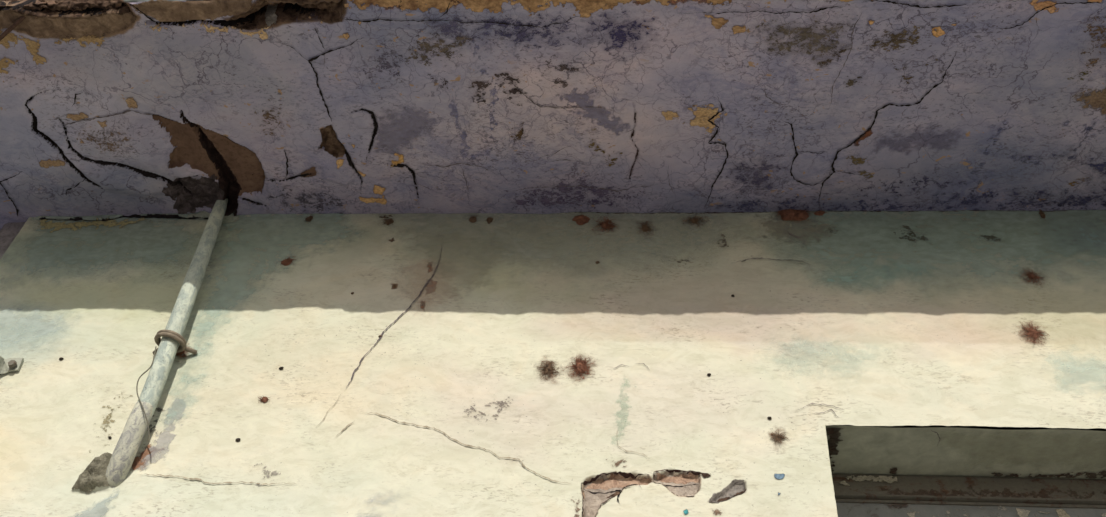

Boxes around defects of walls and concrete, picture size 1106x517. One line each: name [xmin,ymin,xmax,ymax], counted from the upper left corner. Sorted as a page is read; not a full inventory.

spalling [0,0,746,74]
crack [0,91,217,221]
flaking render [152,115,265,214]
crack [242,150,311,209]
crack [276,0,986,265]
rust [776,208,827,223]
rust [1020,267,1044,285]
rust [1014,321,1050,346]
crack [317,243,711,517]
rust [537,355,595,382]
flaking render [574,459,711,517]
flaking render [709,479,746,515]